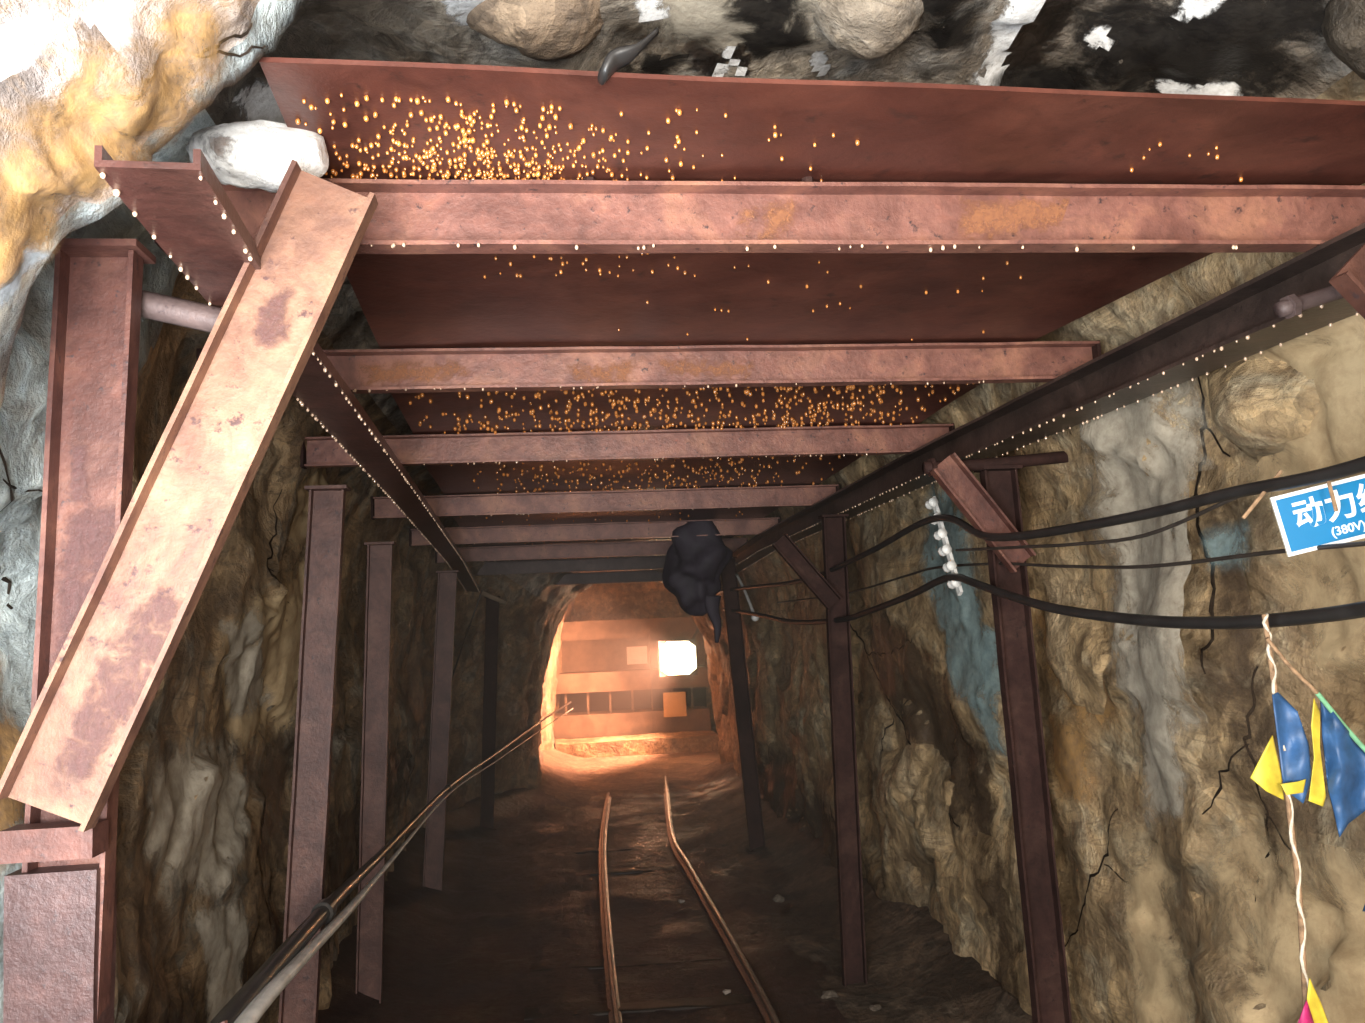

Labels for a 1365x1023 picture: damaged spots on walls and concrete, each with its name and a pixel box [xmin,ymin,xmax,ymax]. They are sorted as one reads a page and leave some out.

corrosion [962,198,1069,238]
corrosion [256,291,290,346]
corrosion [57,589,177,778]
corrosion [221,468,328,756]
crack [1202,666,1291,902]